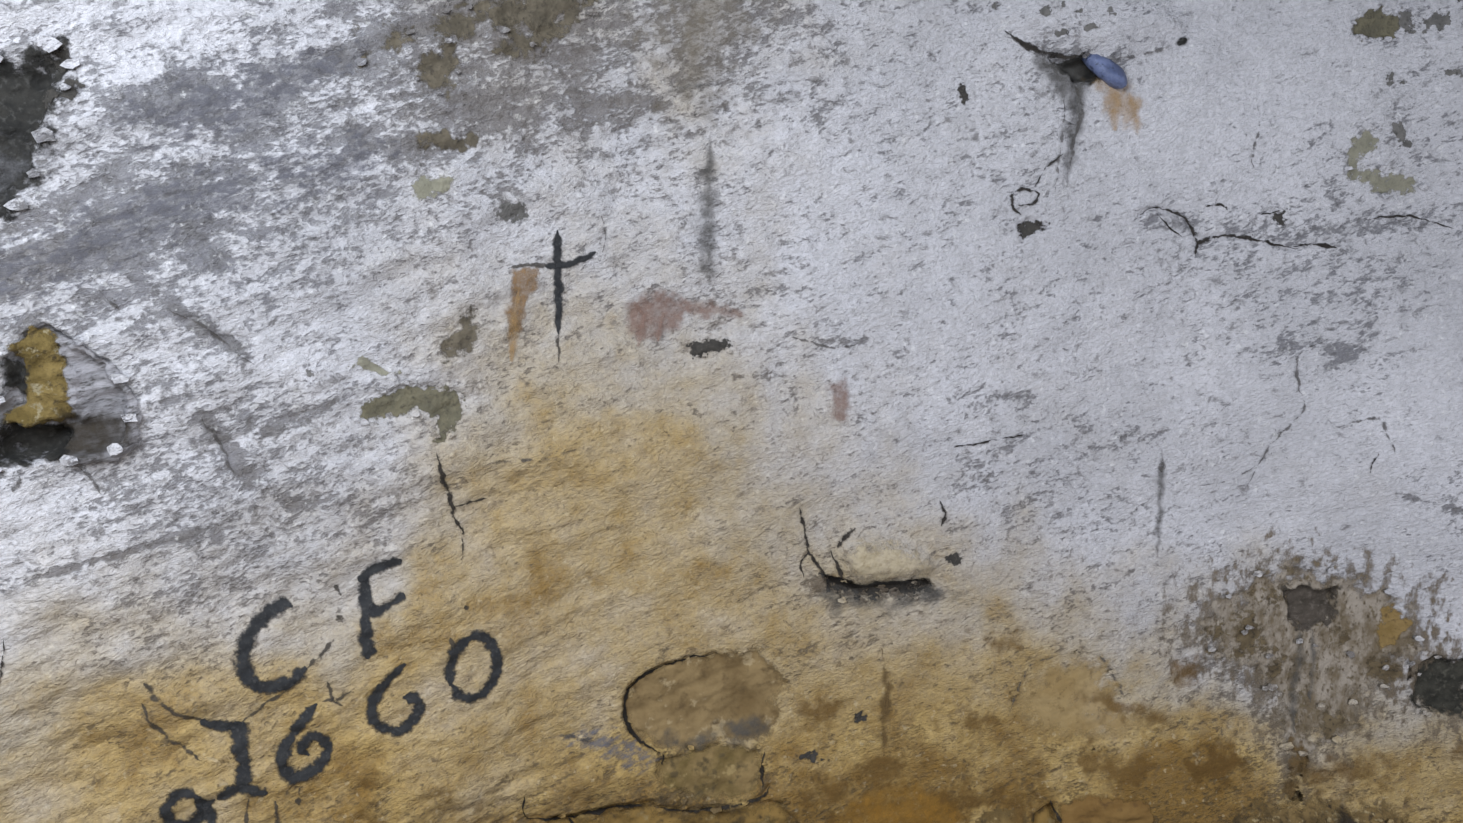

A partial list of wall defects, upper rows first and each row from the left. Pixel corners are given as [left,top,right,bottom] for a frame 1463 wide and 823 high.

spalling [1351,0,1463,42]
spalling [0,35,85,221]
peeling [1344,121,1429,199]
crack [1140,203,1337,254]
crack [1365,214,1451,228]
spalling [0,323,143,472]
crack [799,508,828,581]
crack [939,501,947,526]
damp [1163,528,1463,799]
peeling [1189,555,1463,769]
damp [563,729,663,770]
damp [865,648,902,783]